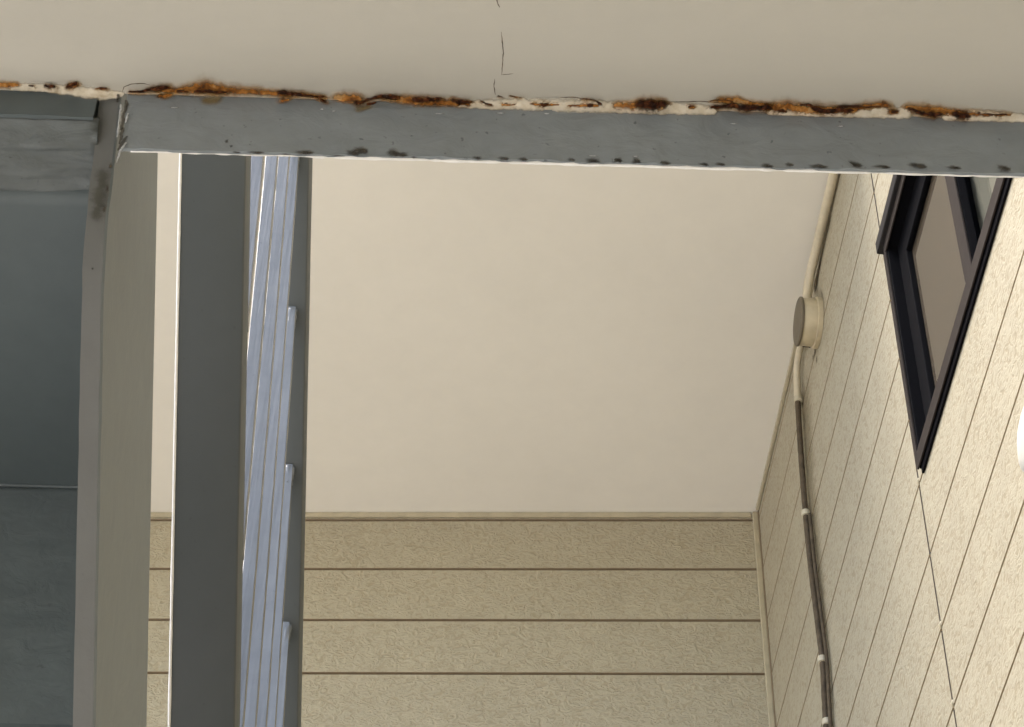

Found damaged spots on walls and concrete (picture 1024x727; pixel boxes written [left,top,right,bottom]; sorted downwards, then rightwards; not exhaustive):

corrosion [128,82,669,111]
peeling [456,98,717,115]
corrosion [710,98,1011,120]